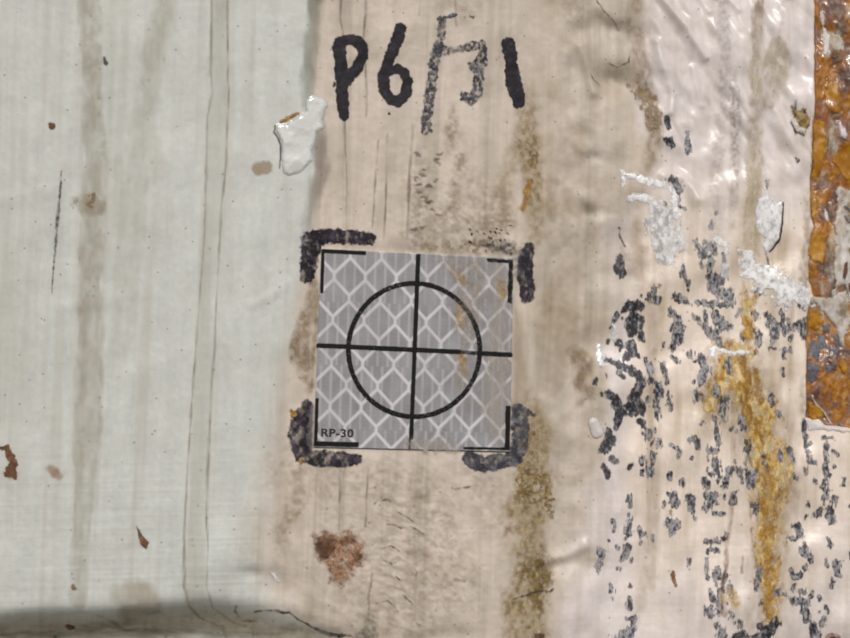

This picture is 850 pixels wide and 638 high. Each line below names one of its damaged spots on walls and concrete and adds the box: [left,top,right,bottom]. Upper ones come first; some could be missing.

peeling [273,96,328,175]
corrosion [791,0,850,428]
corrosion [0,444,18,480]
corrosion [313,530,363,585]
spalling [592,170,850,638]
corrosion [700,291,794,625]